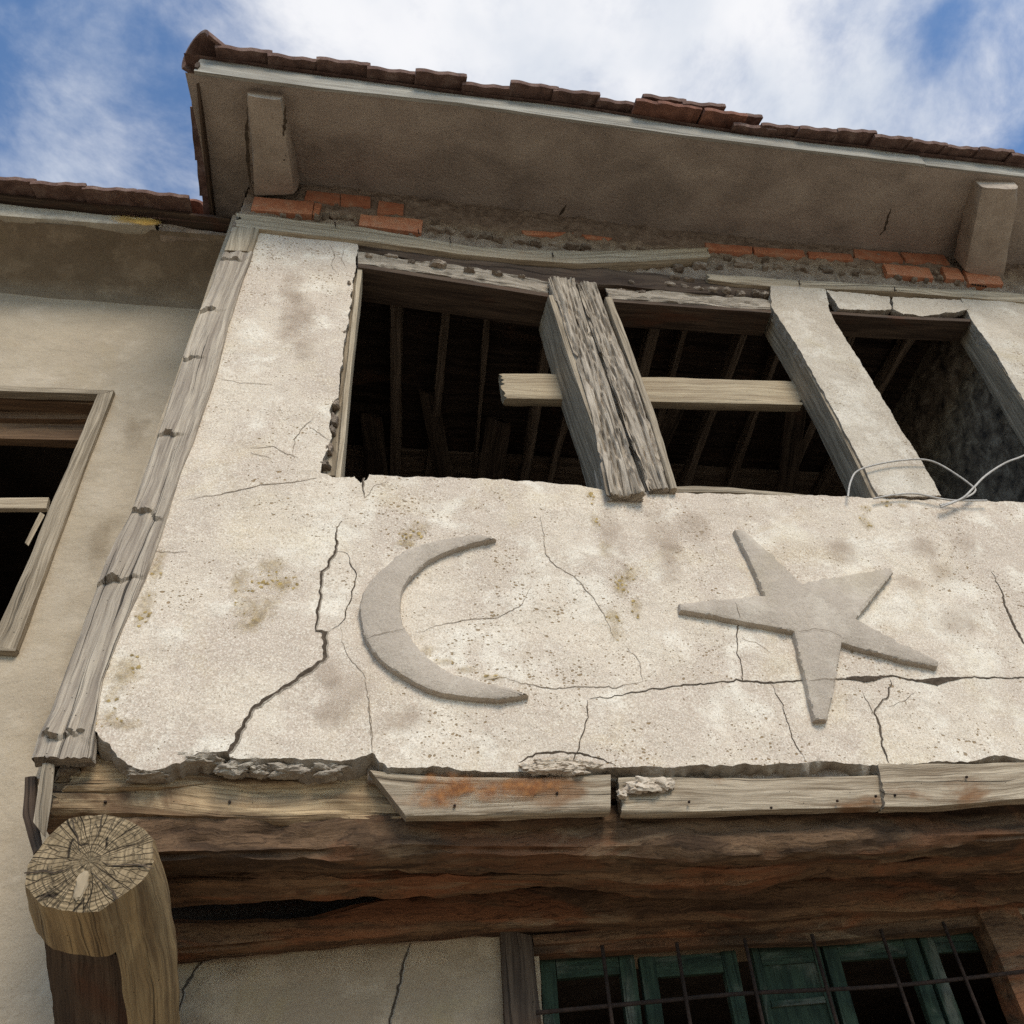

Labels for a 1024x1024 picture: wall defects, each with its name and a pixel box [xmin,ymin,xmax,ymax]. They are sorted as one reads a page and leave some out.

flaking render [320,273,357,477]
crack [188,421,327,500]
crack [227,521,373,754]
crack [487,520,923,765]
crack [960,673,1024,681]
crack [992,573,1024,643]
flaking render [122,767,169,784]
flaking render [178,751,352,782]
flaking render [518,757,604,777]
crack [389,943,411,1024]